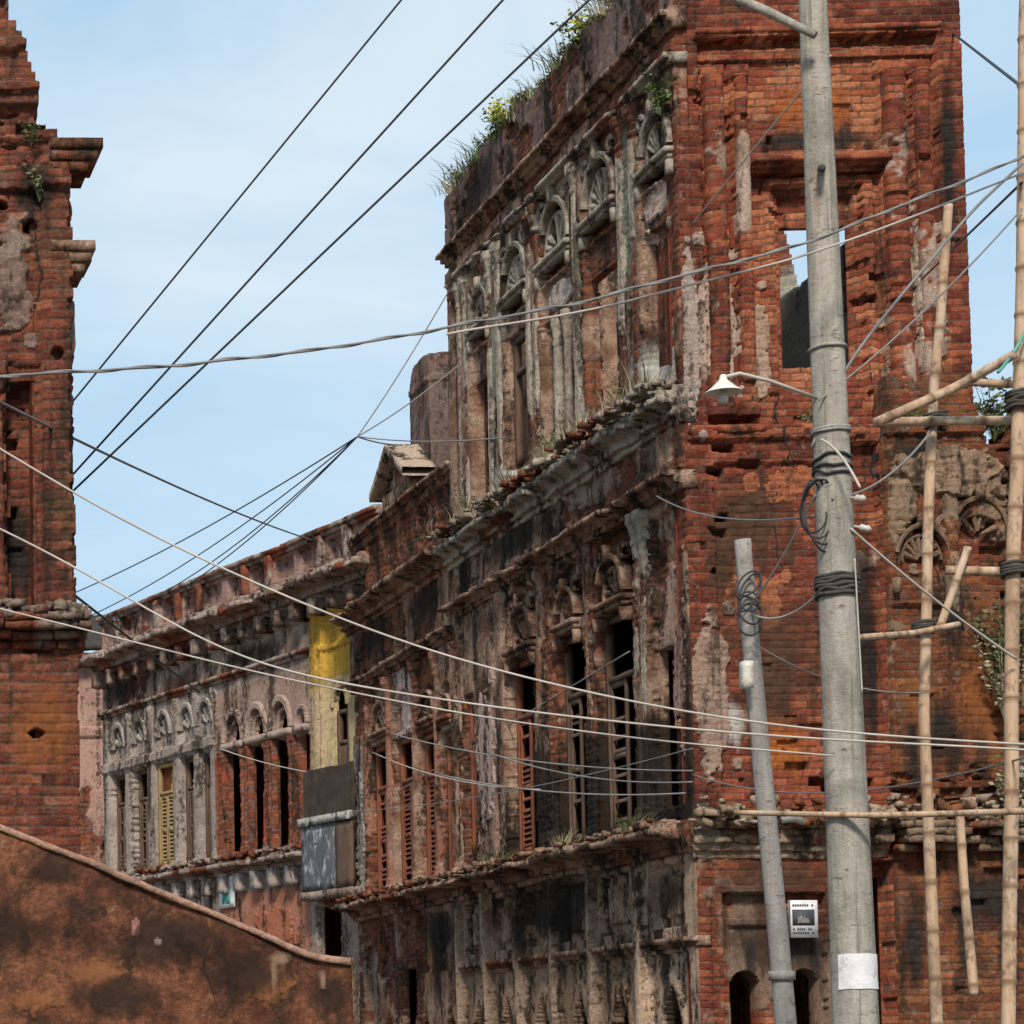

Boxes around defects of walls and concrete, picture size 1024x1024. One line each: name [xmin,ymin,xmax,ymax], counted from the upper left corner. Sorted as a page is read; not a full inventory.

water stain [457,157,494,230]
peeling [0,233,38,349]
peeling [728,249,739,266]
peeling [681,232,711,442]
peeling [886,454,919,575]
spalling [754,569,792,631]
peeling [661,544,742,784]
water stain [73,978,158,1019]
water stain [97,915,284,1001]
water stain [310,973,342,1017]
water stain [511,878,585,966]
water stain [648,879,686,965]